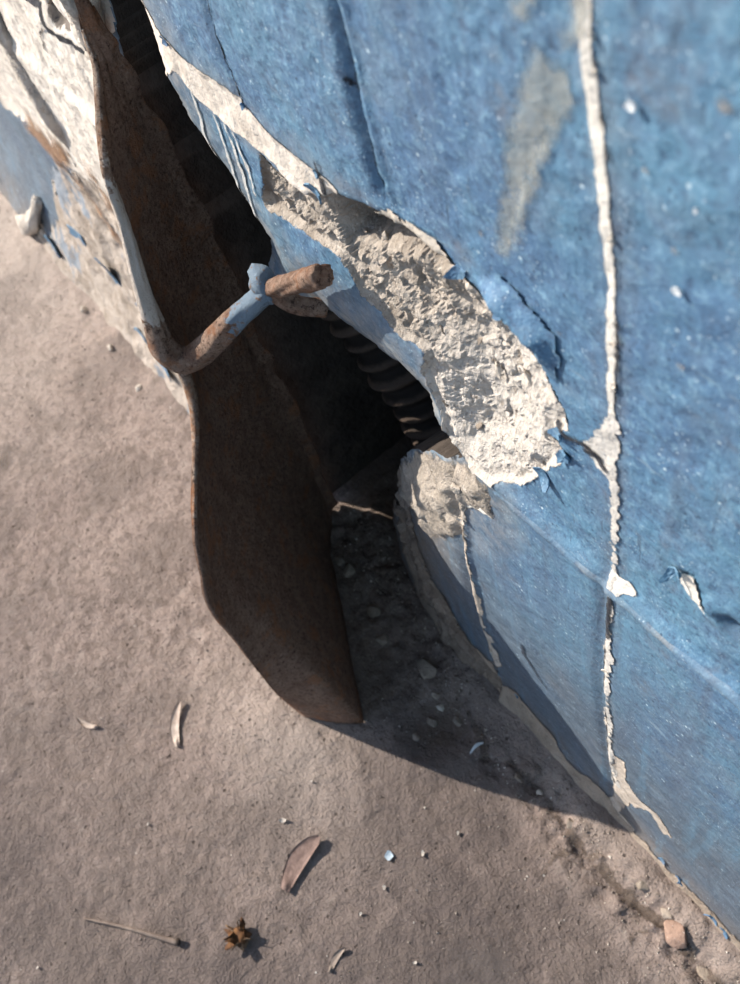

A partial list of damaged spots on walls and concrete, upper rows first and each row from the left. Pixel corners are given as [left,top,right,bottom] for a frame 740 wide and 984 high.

rust [27,115,69,168]
peeling [0,0,190,415]
rust [89,173,119,243]
flaking render [141,0,570,493]
rust [177,373,200,518]
peeling [393,0,740,951]
crack [555,419,607,473]
crack [604,597,612,639]